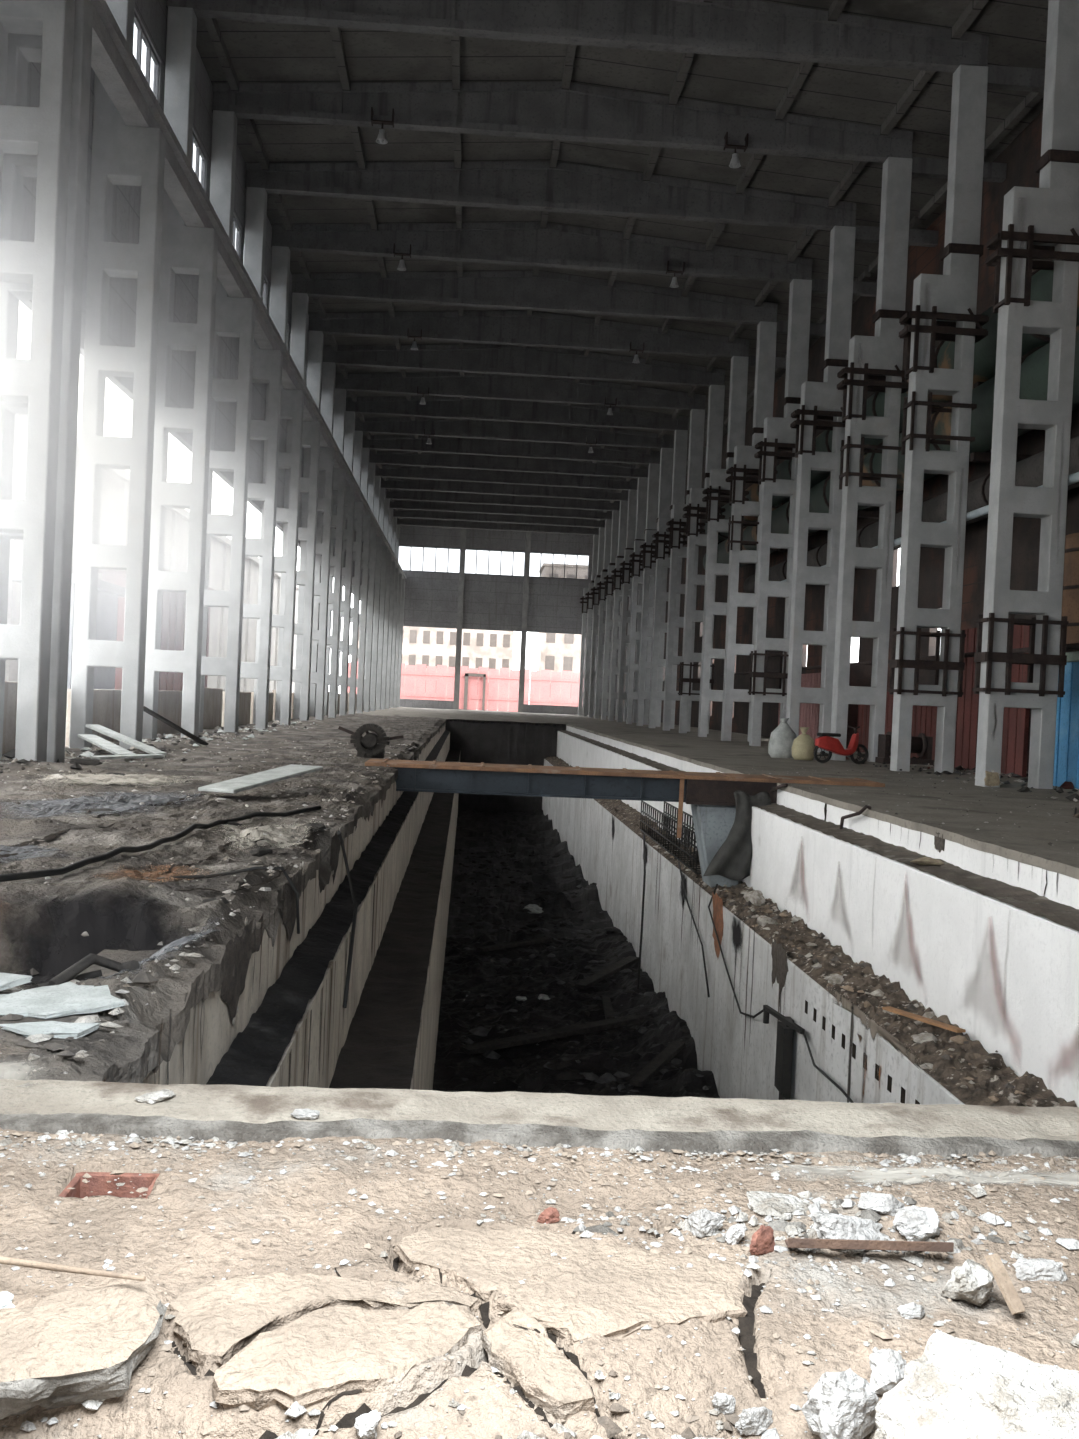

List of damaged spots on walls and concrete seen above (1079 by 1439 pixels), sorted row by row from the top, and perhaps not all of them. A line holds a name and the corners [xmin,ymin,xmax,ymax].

spalling [78,949,159,979]
spalling [143,782,434,1088]
spalling [740,783,1079,1107]
crack [172,1341,215,1376]
crack [315,1246,615,1439]
crack [726,1283,766,1398]
crack [259,1430,278,1439]